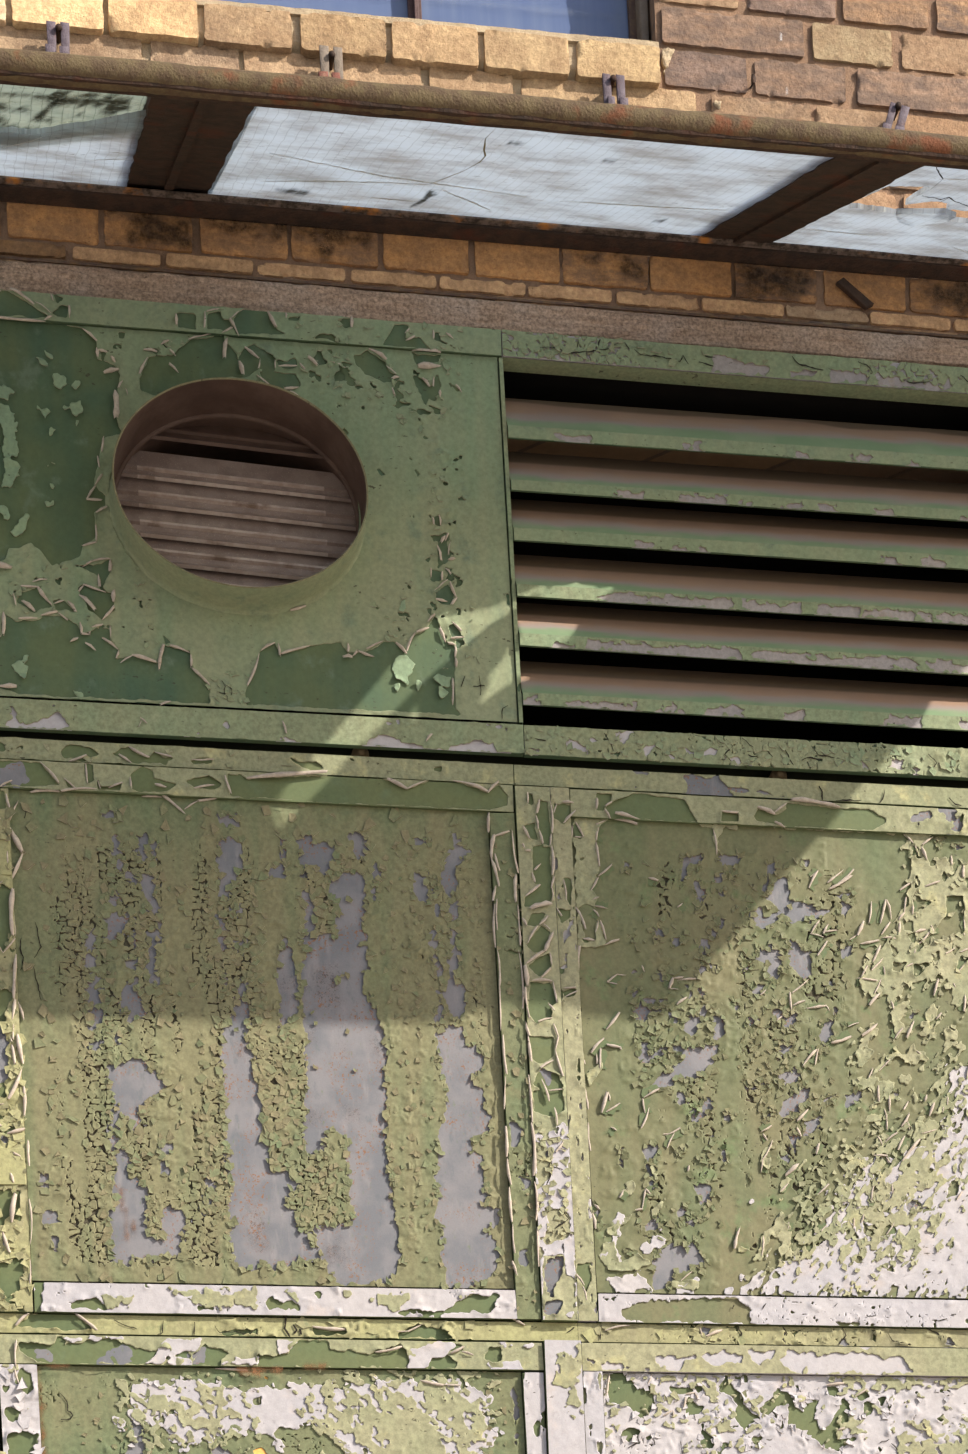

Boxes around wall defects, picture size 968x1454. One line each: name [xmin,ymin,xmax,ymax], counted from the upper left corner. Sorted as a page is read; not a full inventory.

peeling [701,349,770,378]
peeling [790,363,952,392]
peeling [554,433,594,444]
peeling [845,453,873,463]
peeling [0,287,511,754]
spalling [510,487,968,529]
spalling [512,525,968,583]
spalling [506,581,968,631]
spalling [518,631,968,687]
peeling [0,689,968,1454]